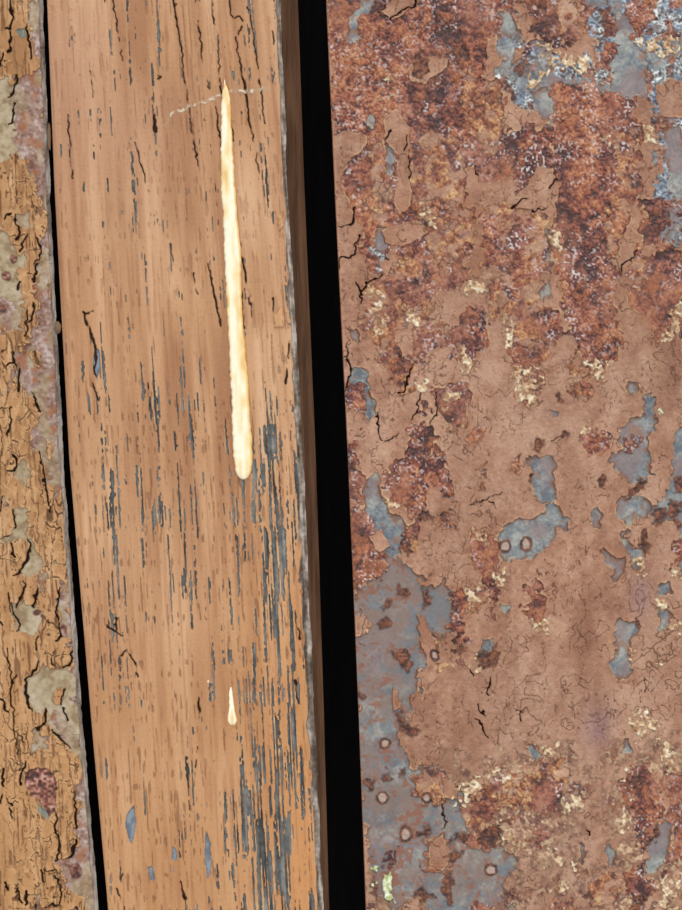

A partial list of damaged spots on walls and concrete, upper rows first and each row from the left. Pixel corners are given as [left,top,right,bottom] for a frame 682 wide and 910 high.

crack [0,0,32,125]
peeling [145,0,161,156]
peeling [121,151,138,233]
corrosion [327,0,682,675]
peeling [81,323,204,709]
peeling [498,455,570,562]
peeling [590,507,603,529]
peeling [600,381,682,632]
peeling [354,472,517,910]
peeling [185,757,198,821]
corrosion [366,887,422,910]
corrosion [409,740,682,910]